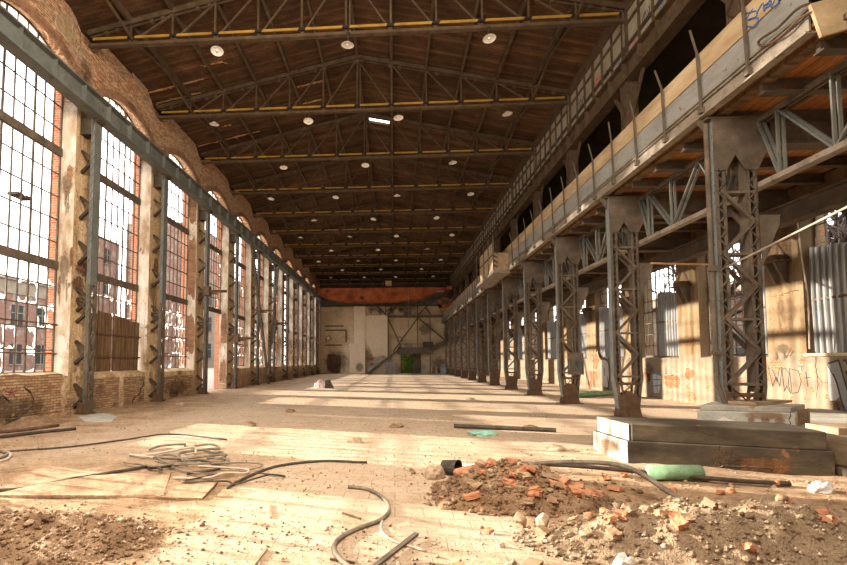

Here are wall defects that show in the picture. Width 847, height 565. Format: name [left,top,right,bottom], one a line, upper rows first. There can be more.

rust [741,458,789,475]